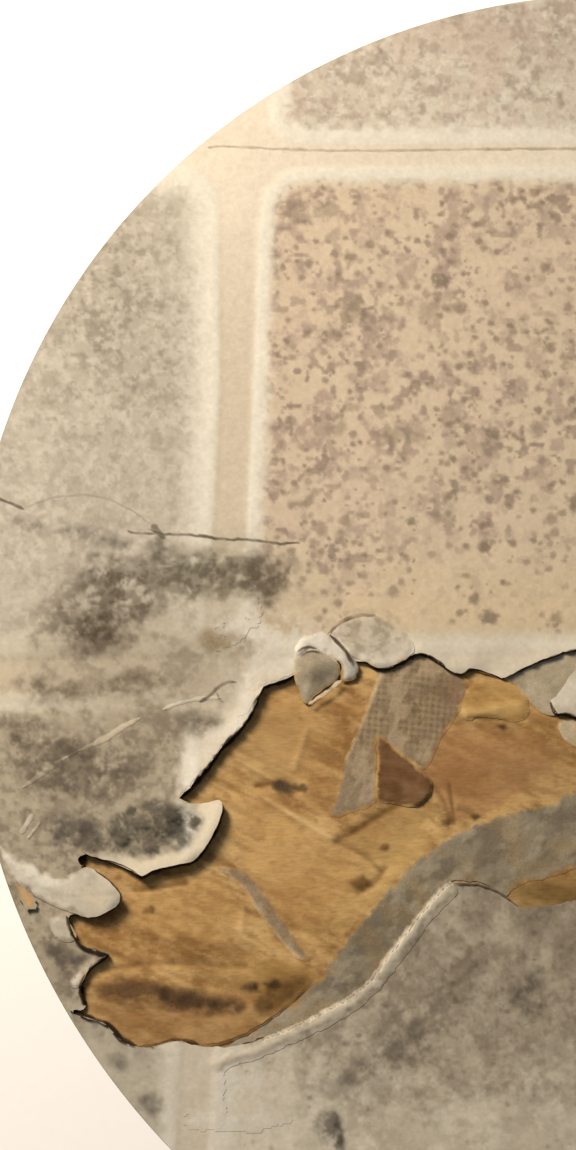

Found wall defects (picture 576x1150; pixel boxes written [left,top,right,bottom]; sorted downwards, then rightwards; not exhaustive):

crack [127,524,297,544]
damp [78,569,150,650]
peeling [461,677,530,722]
damp [176,713,217,727]
peeling [557,717,576,747]
damp [47,739,129,798]
peeling [0,593,415,942]
damp [53,821,94,846]
peeling [69,963,91,989]